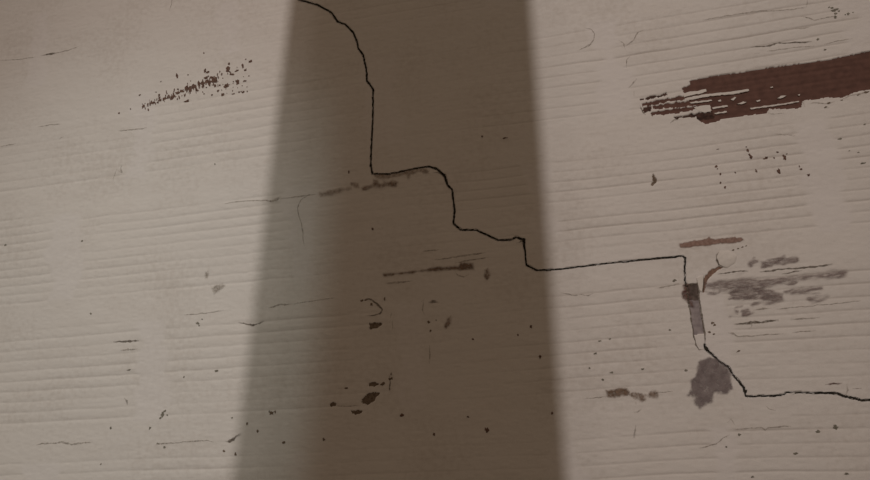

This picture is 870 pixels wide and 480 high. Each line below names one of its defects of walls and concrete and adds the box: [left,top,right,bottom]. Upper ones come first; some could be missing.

crack [755,38,826,50]
crack [299,0,688,287]
peeling [680,237,747,350]
crack [704,344,870,401]